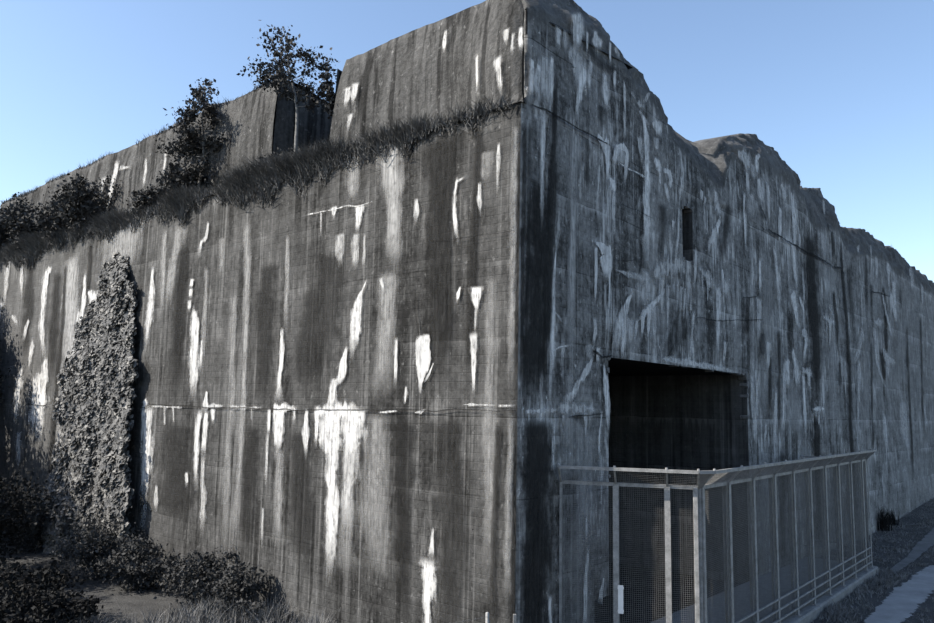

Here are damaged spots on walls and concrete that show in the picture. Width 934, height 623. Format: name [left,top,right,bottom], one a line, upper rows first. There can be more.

leakage [557,14,626,128]
leakage [381,144,402,250]
leakage [638,116,682,240]
leakage [12,245,97,474]
leakage [146,229,207,382]
leakage [141,392,218,505]
leakage [227,230,288,533]
leakage [268,349,364,548]
leakage [351,284,365,340]
leakage [379,277,397,375]
leakage [422,422,465,623]
leakage [738,151,854,534]